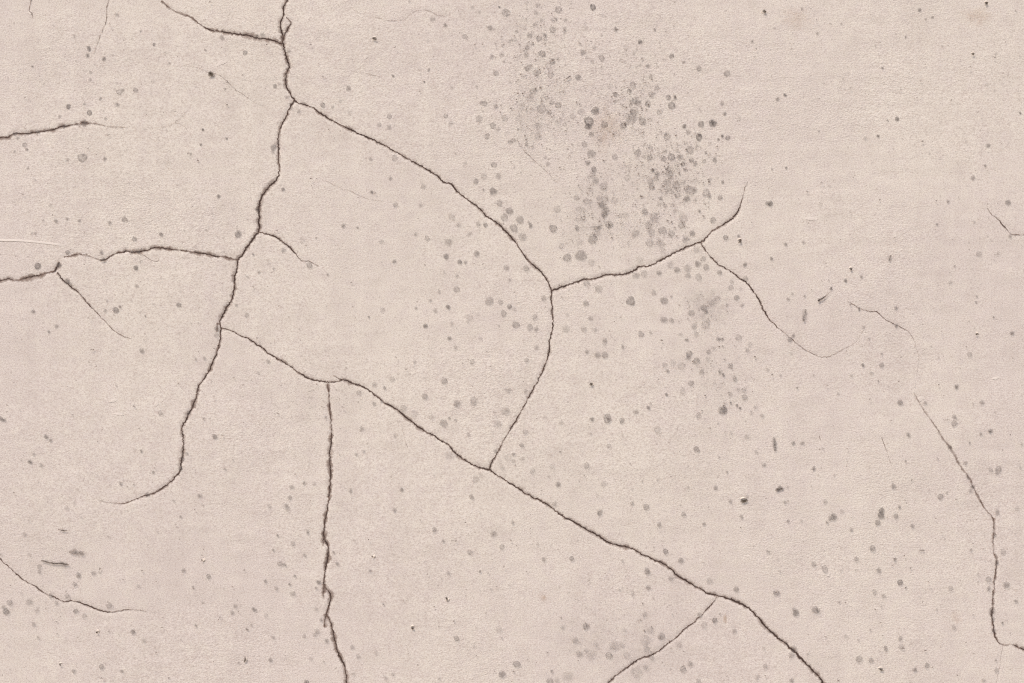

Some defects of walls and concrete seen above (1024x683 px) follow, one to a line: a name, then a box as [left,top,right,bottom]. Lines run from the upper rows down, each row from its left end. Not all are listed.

crack [0,121,97,139]
mould [565,79,730,245]
crack [0,253,123,336]
crack [101,0,824,683]
crack [0,558,142,613]
crack [923,409,1024,650]